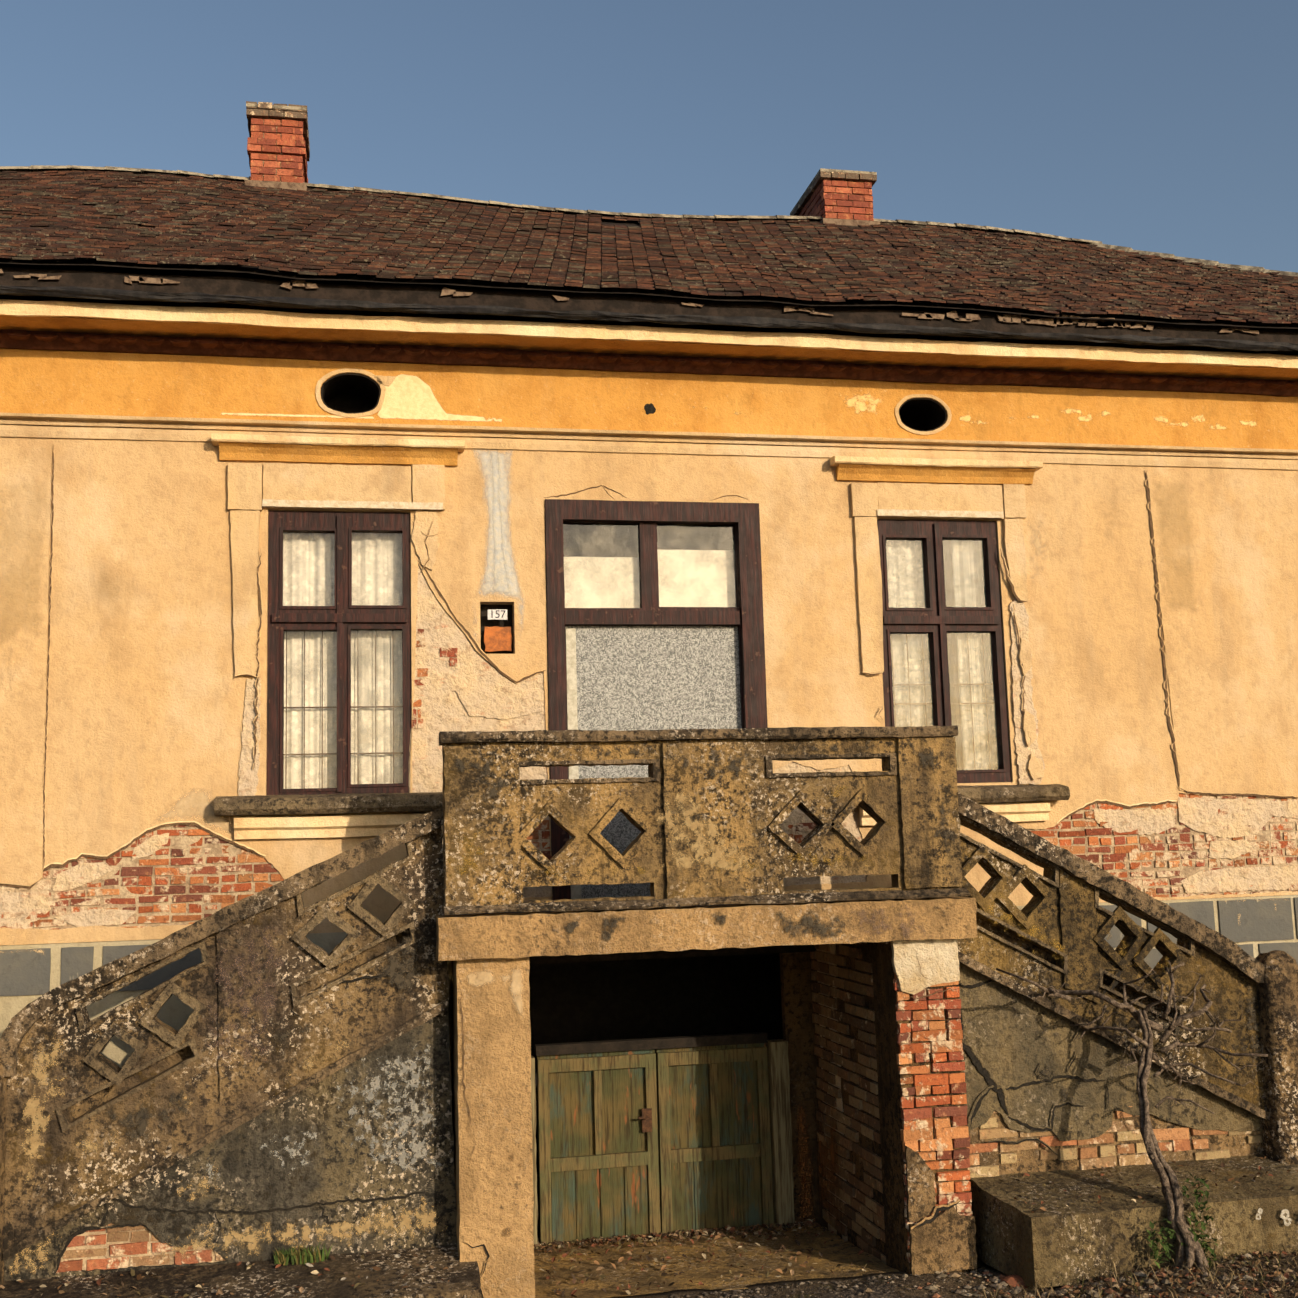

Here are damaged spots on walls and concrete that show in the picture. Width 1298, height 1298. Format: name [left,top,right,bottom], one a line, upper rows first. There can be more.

crack [42,444,55,870]
flaking render [0,791,285,930]
flaking render [409,559,548,793]
leakage [708,745,750,780]
leakage [776,910,852,937]
crack [1000,548,1031,745]
flaking render [1027,793,1298,900]
crack [1144,469,1298,798]
leakage [261,1127,317,1170]
leakage [337,1044,446,1173]
crack [909,958,1133,1155]
flaking render [893,967,1263,1263]